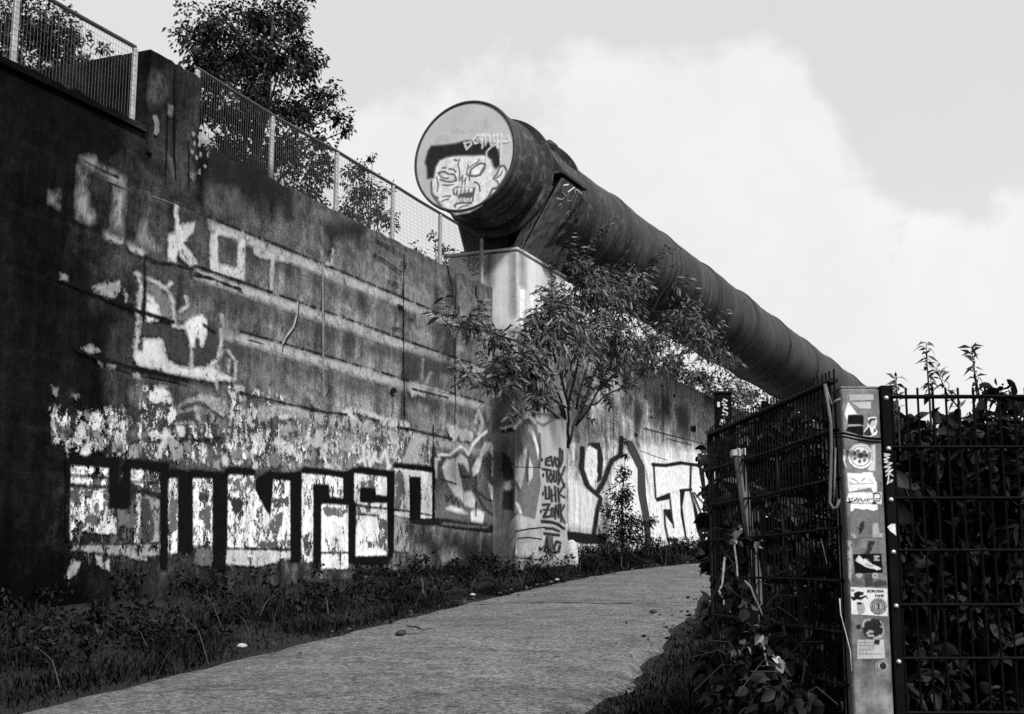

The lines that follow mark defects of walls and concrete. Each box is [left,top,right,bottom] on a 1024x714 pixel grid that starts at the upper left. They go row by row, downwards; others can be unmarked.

spalling [47,189,490,370]
peeling [50,324,493,579]